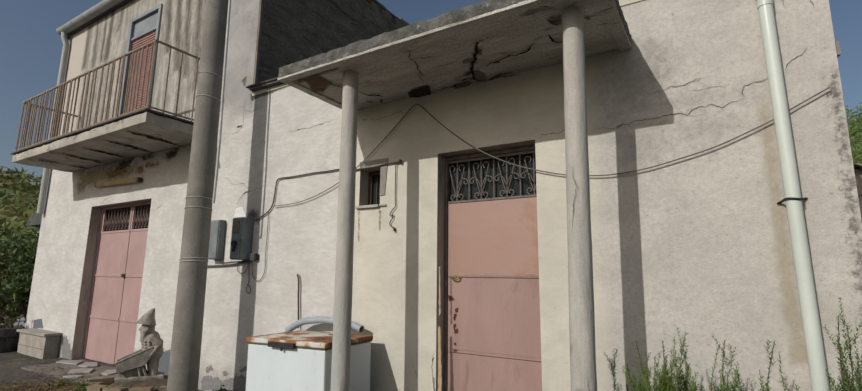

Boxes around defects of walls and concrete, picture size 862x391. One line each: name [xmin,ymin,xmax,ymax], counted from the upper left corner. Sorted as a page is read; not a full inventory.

spalling [295,67,338,93]
crack [408,6,563,92]
crack [599,51,805,129]